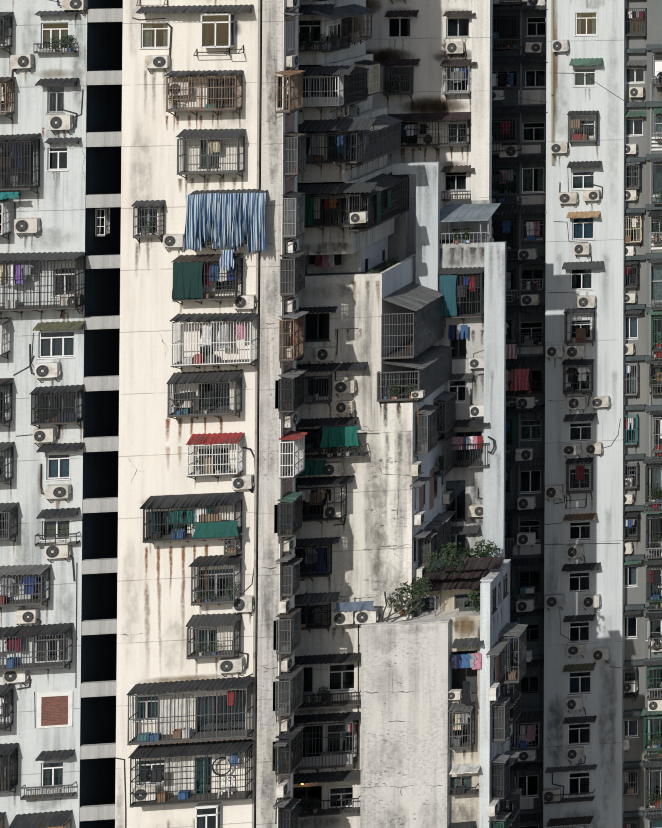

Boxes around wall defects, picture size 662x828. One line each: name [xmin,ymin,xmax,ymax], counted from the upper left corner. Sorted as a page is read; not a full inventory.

corrosion [145,547,172,581]
corrosion [182,545,208,583]